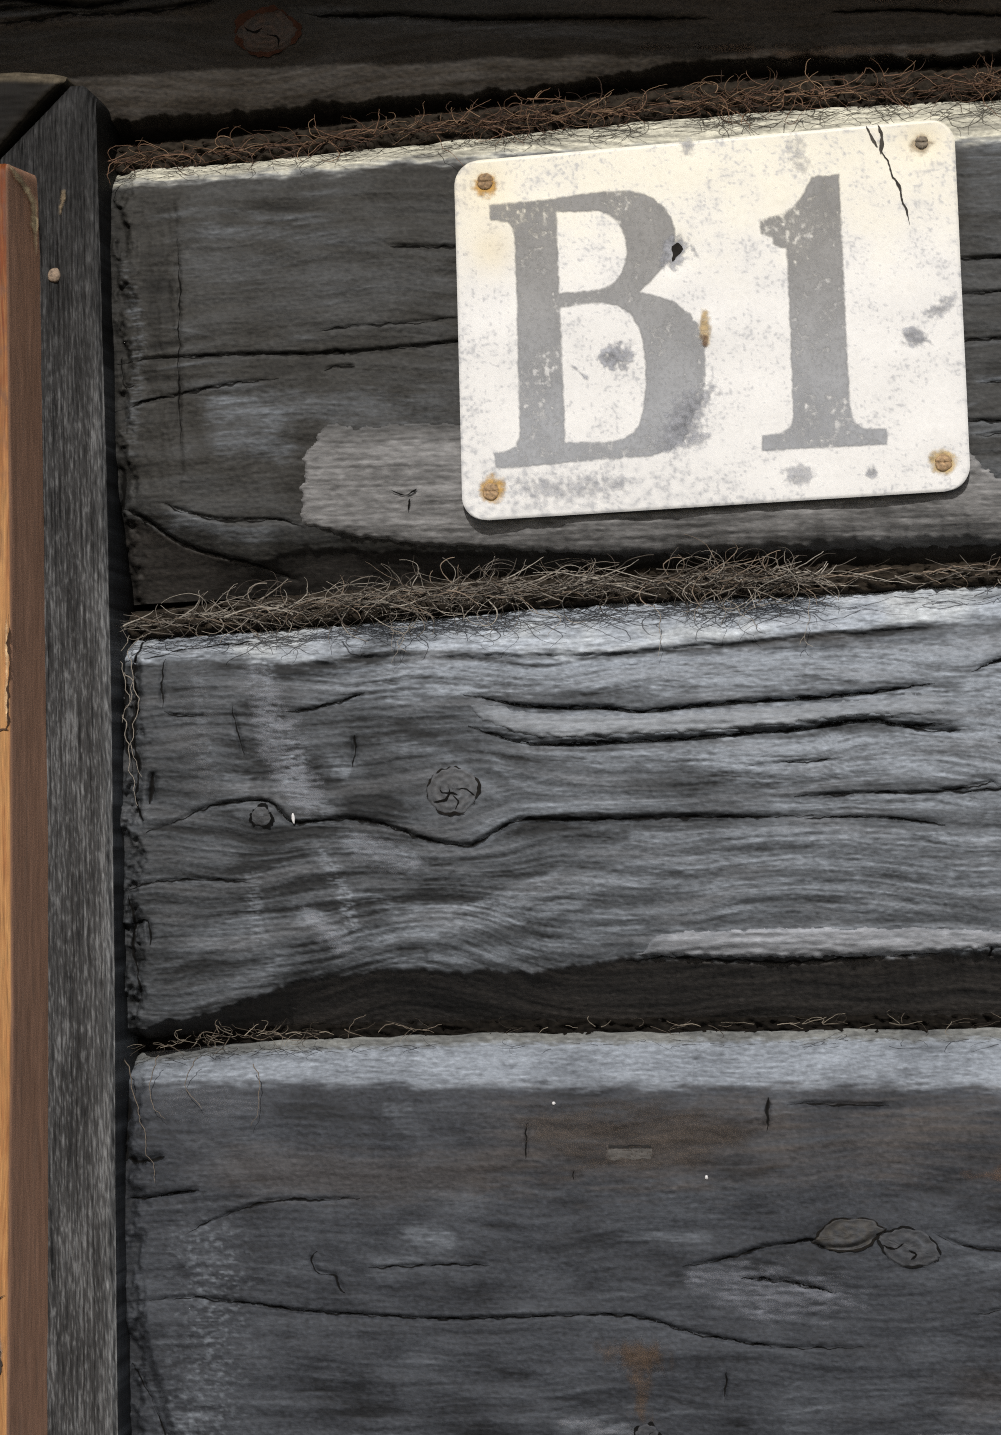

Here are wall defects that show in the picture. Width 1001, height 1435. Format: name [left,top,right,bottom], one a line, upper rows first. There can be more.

crack [866,124,910,224]
crack [124,641,1001,848]
crack [126,1097,360,1233]
crack [128,1251,862,1402]